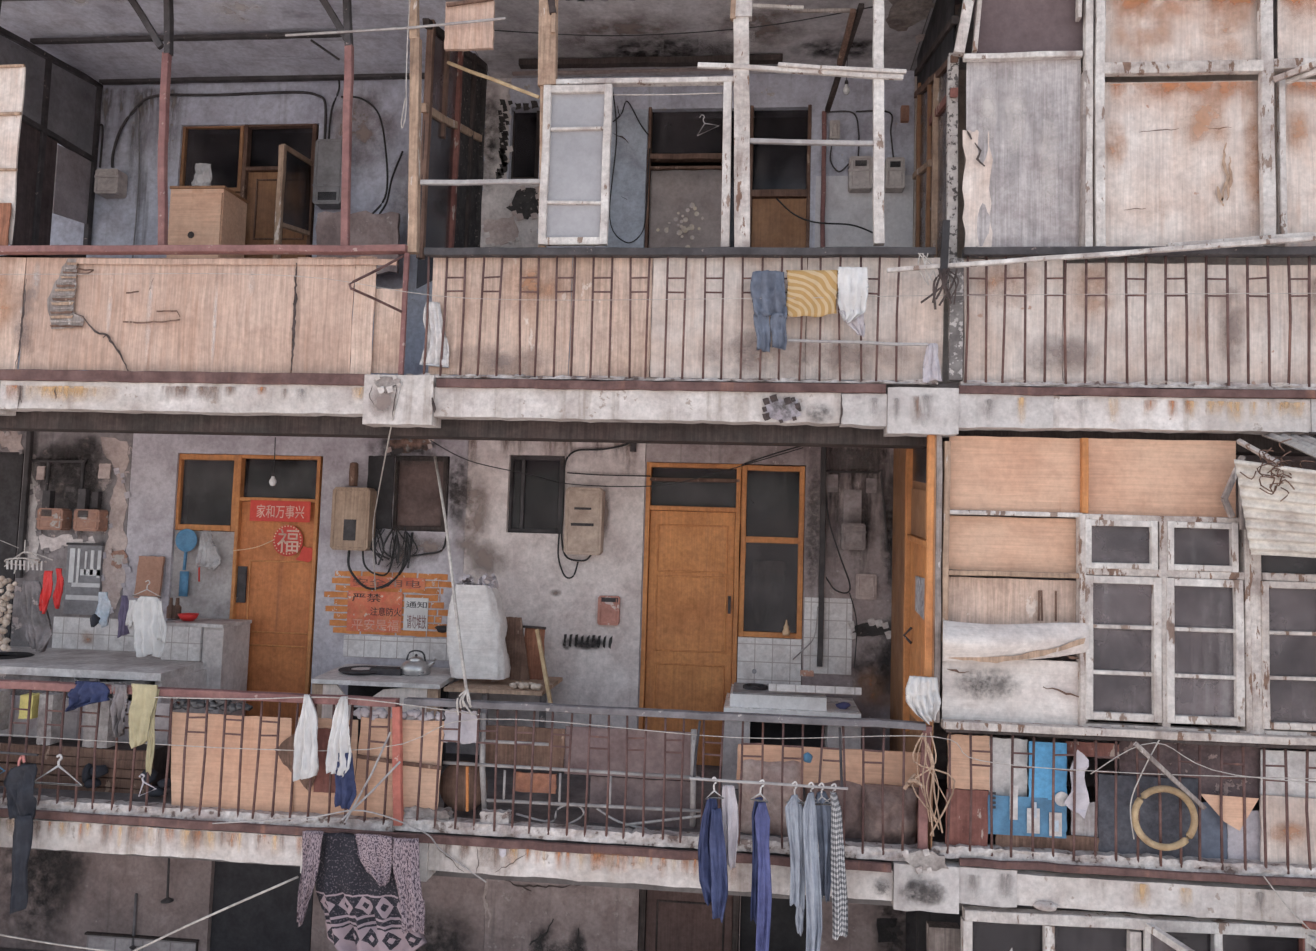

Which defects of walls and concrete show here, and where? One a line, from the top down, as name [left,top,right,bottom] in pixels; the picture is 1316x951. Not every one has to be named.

corrosion [1111,81,1252,138]
crack [75,313,129,371]
peeling [24,437,131,614]
leakage [529,919,584,951]